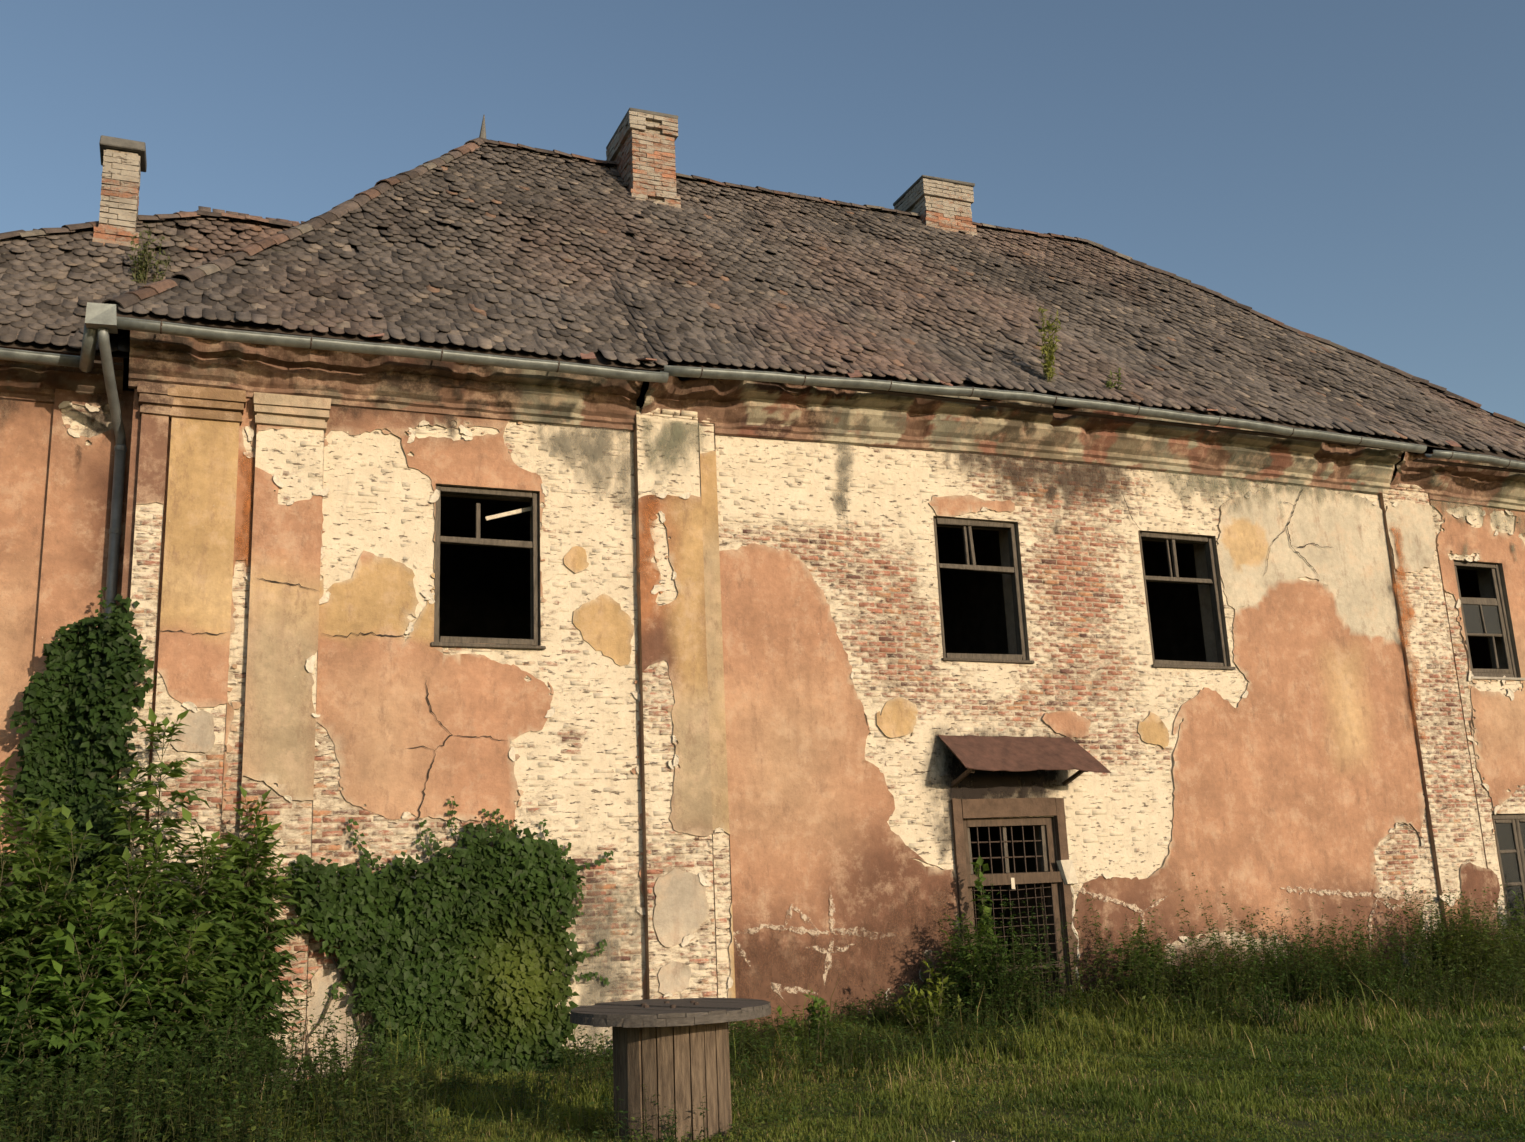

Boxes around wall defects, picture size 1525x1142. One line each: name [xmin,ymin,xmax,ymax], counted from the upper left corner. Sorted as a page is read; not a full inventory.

flaking render [58,401,113,446]
damp [542,420,702,503]
damp [836,443,852,510]
damp [960,452,1130,504]
crack [1266,492,1334,573]
crack [413,680,507,821]
flaking render [111,406,1292,1088]
flaking render [1327,476,1525,961]
damp [737,891,959,1037]